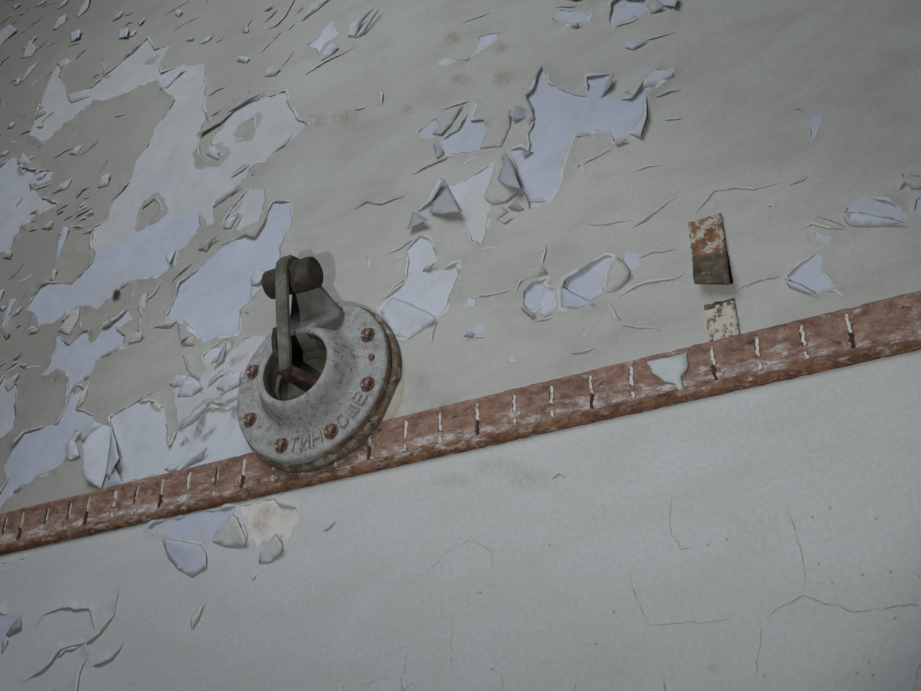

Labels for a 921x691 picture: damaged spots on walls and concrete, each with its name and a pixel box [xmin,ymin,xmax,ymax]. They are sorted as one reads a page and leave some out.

peeling [263,7,379,76]
peeling [547,0,687,37]
peeling [367,57,685,354]
peeling [802,171,921,233]
peeling [0,0,328,513]
peeling [746,248,849,302]
corrosion [0,291,921,555]
peeling [0,553,30,574]
peeling [141,490,303,581]